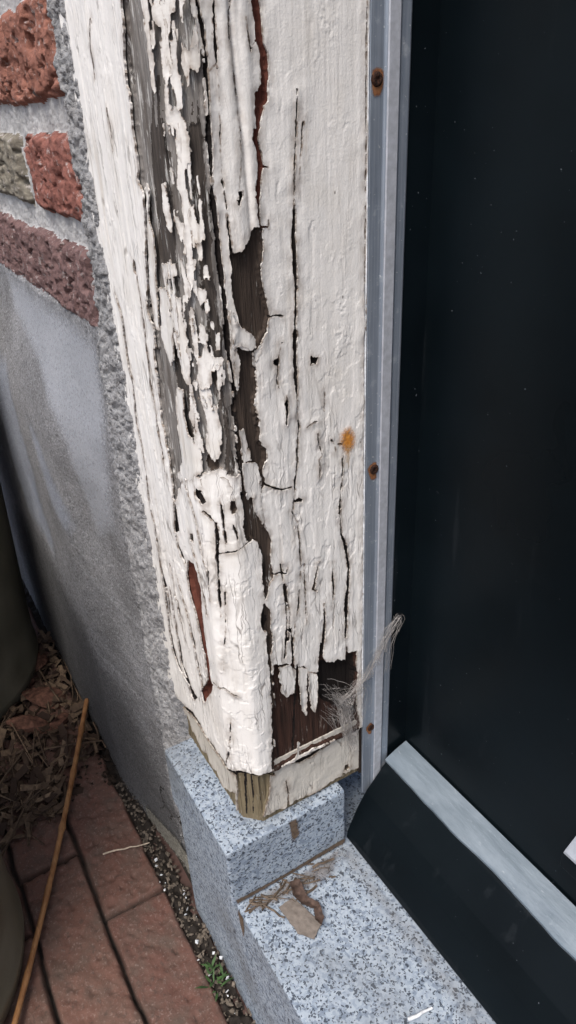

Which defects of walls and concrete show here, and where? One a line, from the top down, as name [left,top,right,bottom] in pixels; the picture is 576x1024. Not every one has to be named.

peeling [123,0,360,821]
crack [157,0,350,751]
corrosion [341,429,354,451]
corrosion [372,68,384,96]